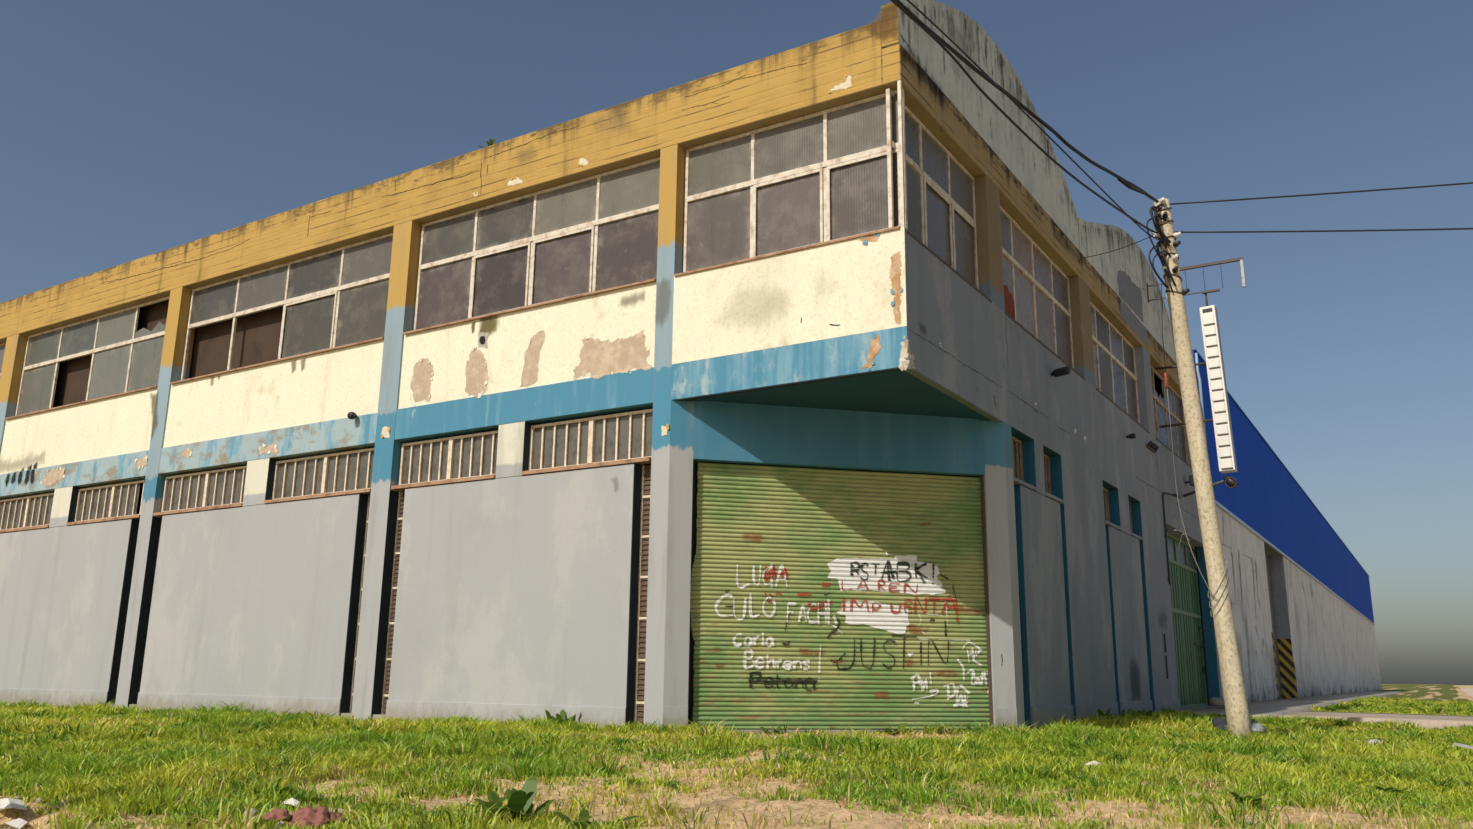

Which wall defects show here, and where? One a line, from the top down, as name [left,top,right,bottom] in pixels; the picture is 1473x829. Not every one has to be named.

damp [867,4,898,38]
damp [902,50,943,102]
peeling [859,230,880,245]
peeling [890,251,915,371]
peeling [410,358,434,407]
peeling [465,332,489,398]
peeling [519,330,546,387]
peeling [572,330,652,379]
peeling [859,332,881,370]